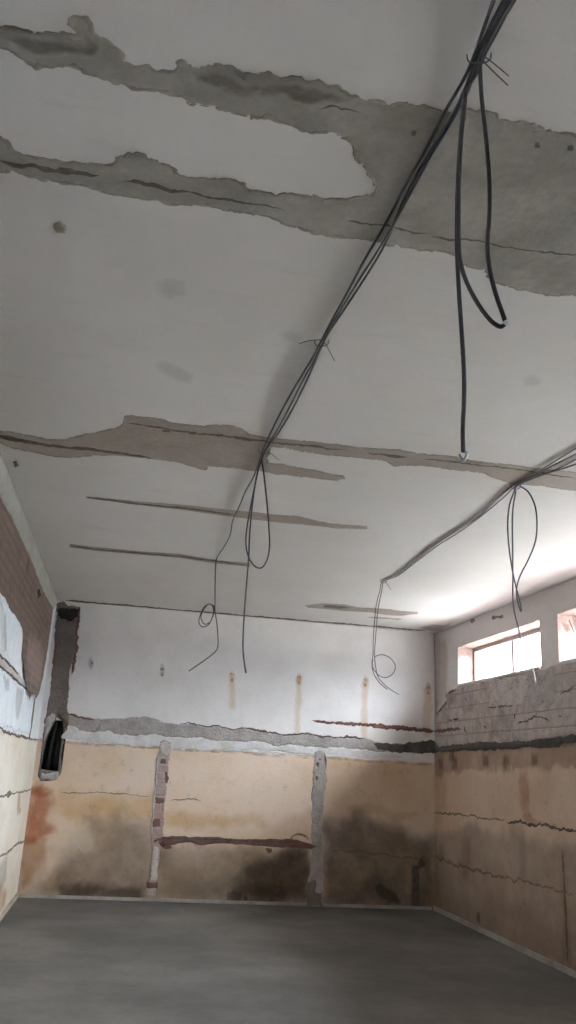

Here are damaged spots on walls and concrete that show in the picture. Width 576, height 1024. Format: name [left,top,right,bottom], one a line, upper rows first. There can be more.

spalling [0,15,576,297]
spalling [0,415,576,491]
spalling [86,496,368,529]
spalling [69,544,251,567]
flaking render [0,498,57,735]
spalling [306,603,418,620]
corrosion [291,671,305,734]
flaking render [435,662,576,747]
peeling [61,713,404,780]
water stain [26,736,576,971]
crack [434,811,576,962]